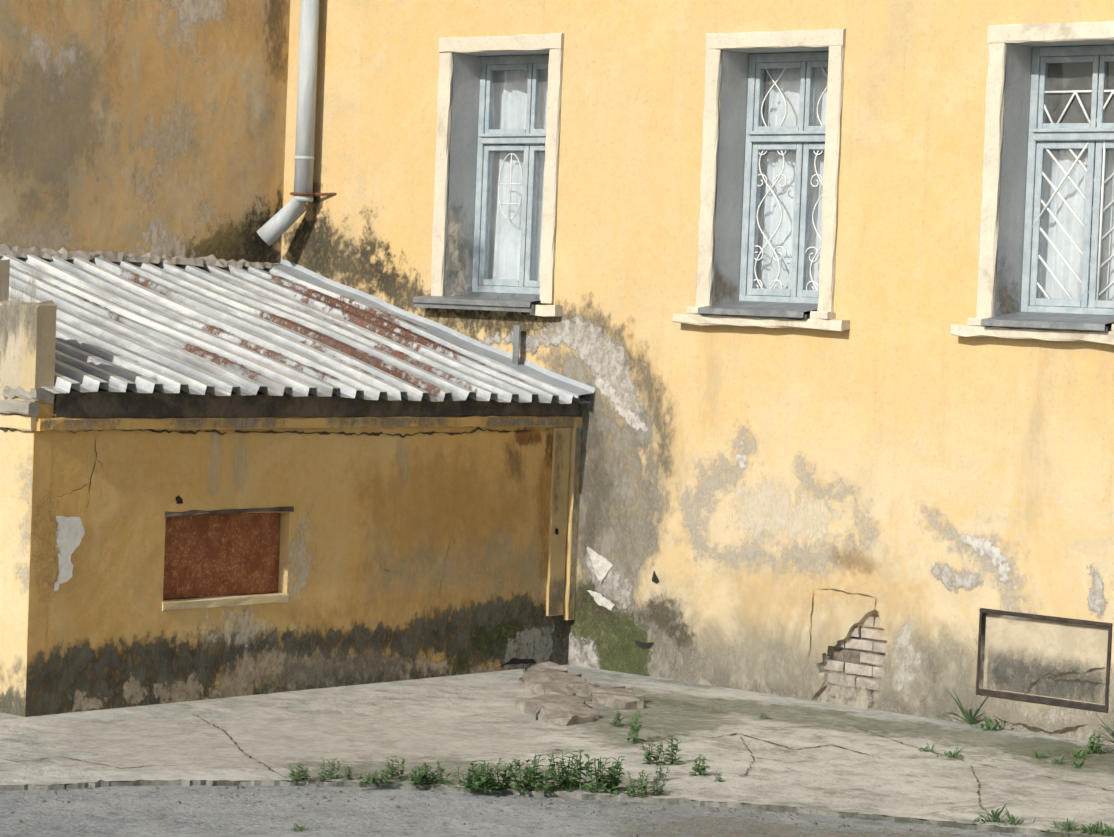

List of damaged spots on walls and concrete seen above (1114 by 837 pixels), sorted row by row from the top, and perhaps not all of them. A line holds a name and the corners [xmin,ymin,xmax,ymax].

water stain [160,0,248,46]
water stain [170,187,551,341]
corrosion [182,344,259,380]
corrosion [203,324,340,380]
flaking render [19,493,85,602]
crack [59,427,553,511]
water stain [0,346,1114,745]
peeling [585,547,633,616]
peeling [681,427,875,573]
peeling [923,508,1021,616]
peeling [1087,567,1106,617]
flaking render [816,610,888,708]